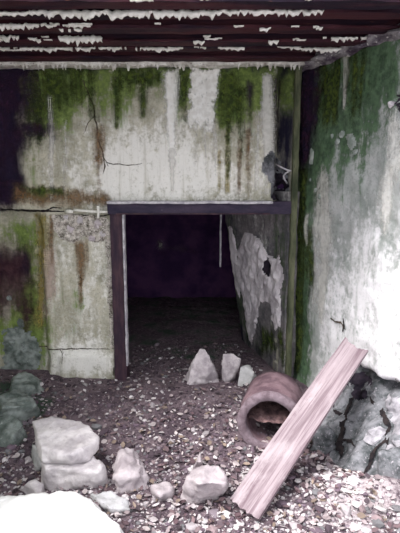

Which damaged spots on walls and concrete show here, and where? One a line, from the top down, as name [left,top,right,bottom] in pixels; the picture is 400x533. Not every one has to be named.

peeling [0,9,324,53]
peeling [268,25,367,54]
crack [0,205,65,213]
damp [0,68,95,211]
crack [83,80,142,173]
damp [112,67,253,191]
damp [294,48,366,374]
damp [380,111,400,233]
spalling [51,213,114,350]
flaking render [228,226,284,345]
crack [333,397,356,461]
crack [363,396,392,475]